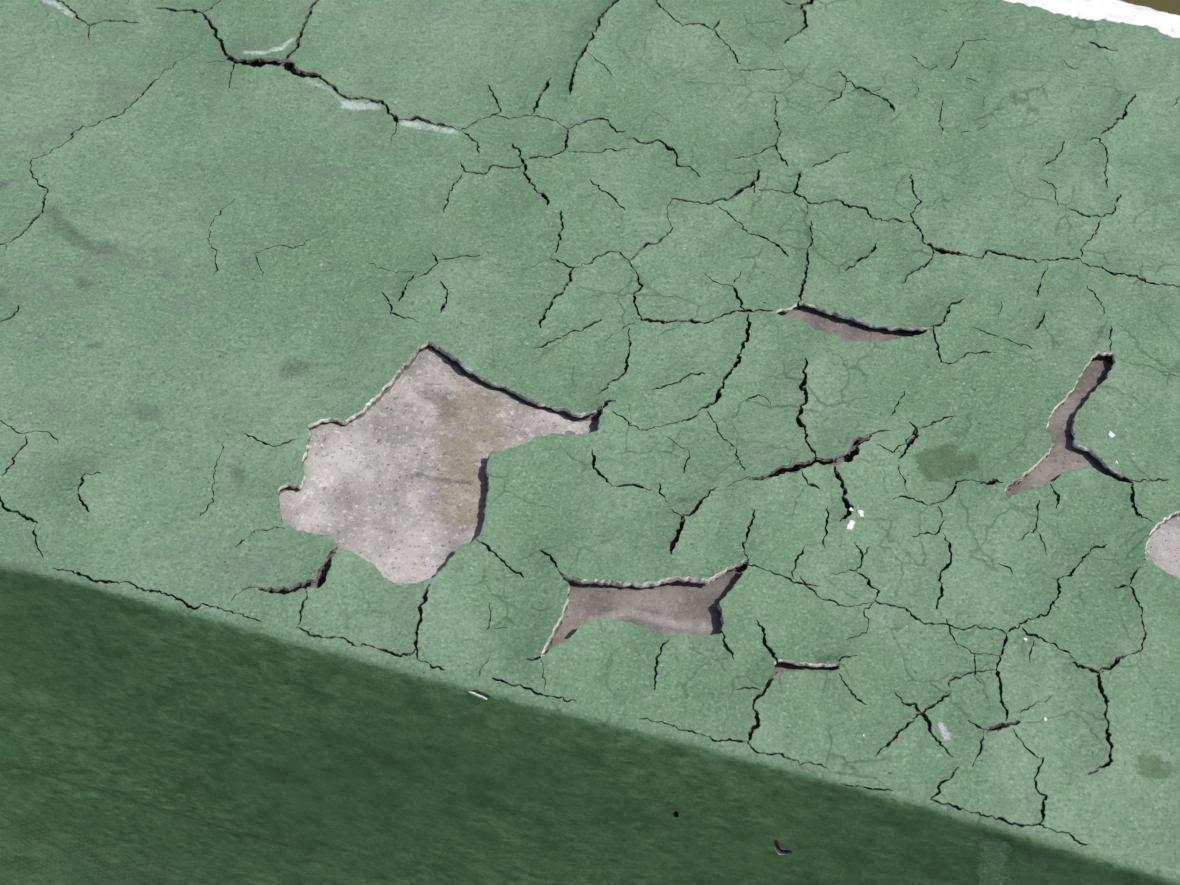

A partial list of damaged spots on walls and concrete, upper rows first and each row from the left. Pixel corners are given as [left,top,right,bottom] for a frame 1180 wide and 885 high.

crack [0,51,195,254]
crack [155,0,701,209]
crack [656,0,784,71]
crack [829,38,991,134]
peeling [772,302,932,342]
peeling [278,340,603,592]
crack [535,94,1180,845]
peeling [1004,351,1131,498]
crack [0,420,444,670]
crack [475,539,558,578]
peeling [541,558,749,666]
peeling [1141,511,1180,579]